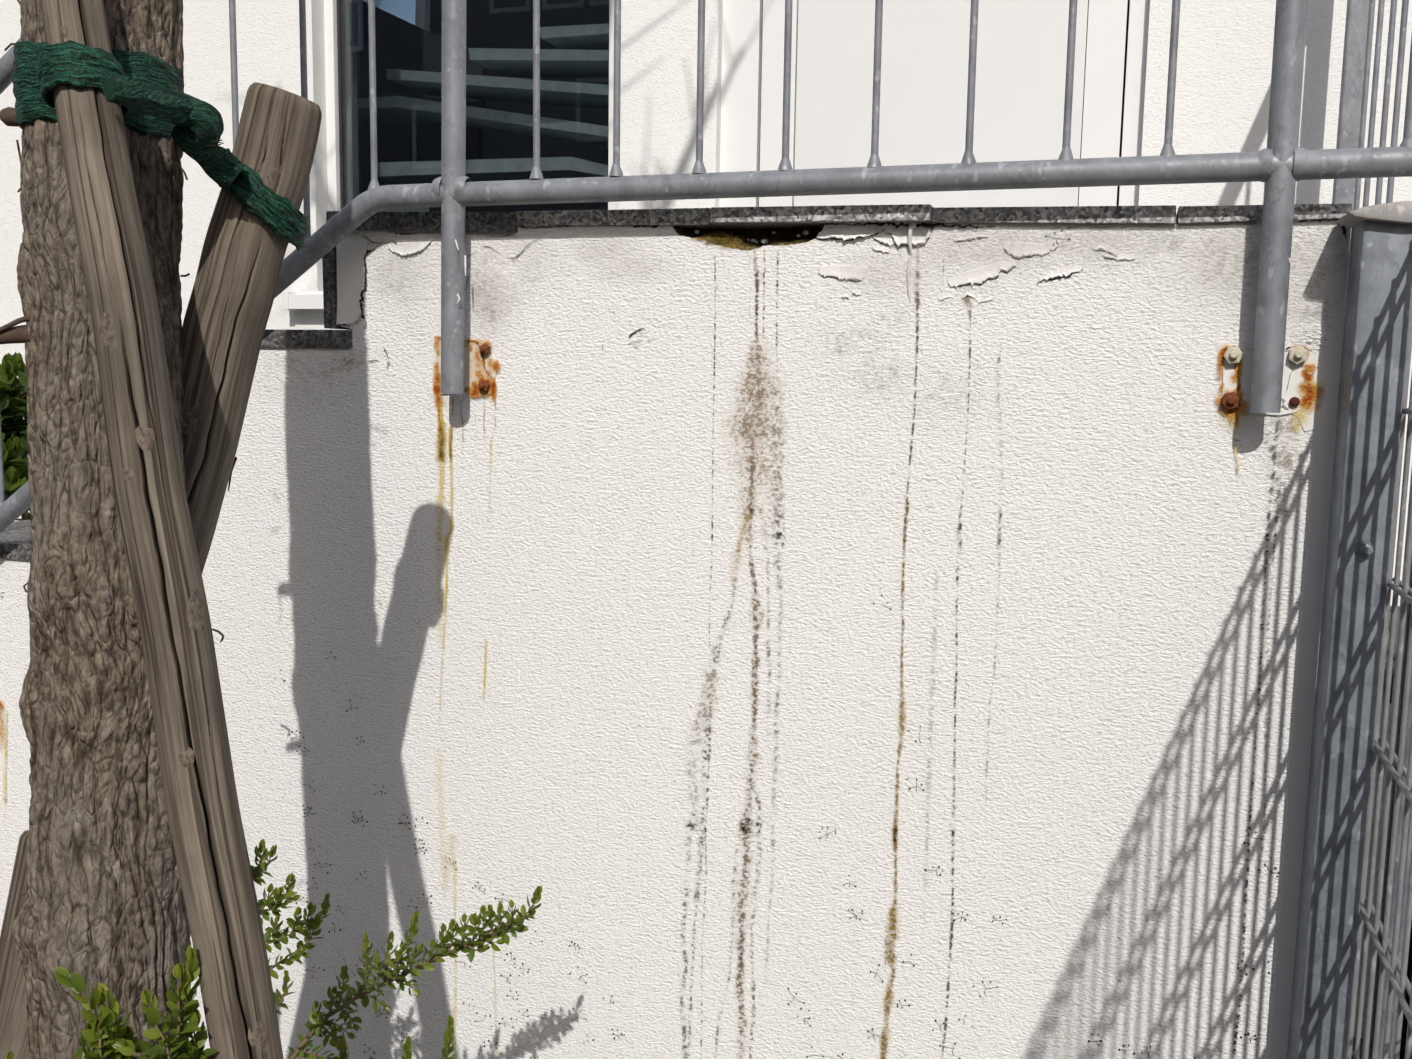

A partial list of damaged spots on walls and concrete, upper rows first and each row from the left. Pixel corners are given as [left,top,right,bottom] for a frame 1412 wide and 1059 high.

crack [335,233,417,368]
spalling [673,226,930,254]
peeling [938,235,1059,304]
peeling [1036,266,1083,286]
peeling [1091,245,1136,261]
corrosion [433,336,500,611]
corrosion [1216,345,1247,471]
damp [1260,419,1296,630]
corrosion [1281,346,1323,428]
damp [680,250,782,1059]
damp [881,482,909,1059]
damp [1233,650,1269,1055]